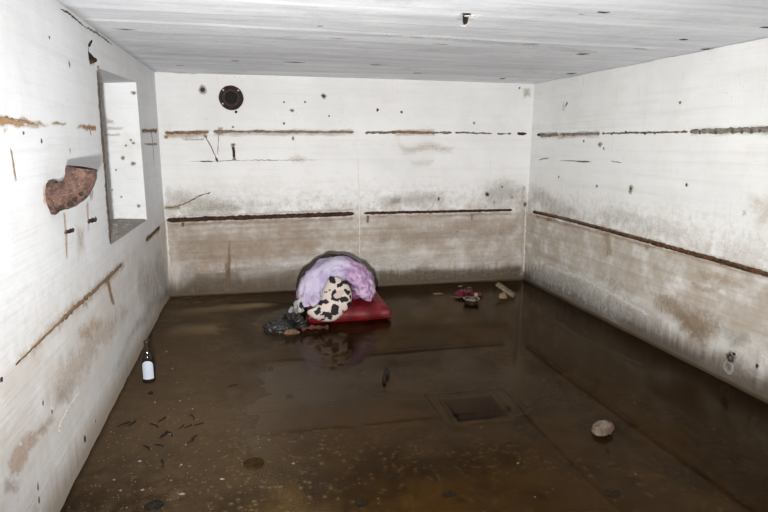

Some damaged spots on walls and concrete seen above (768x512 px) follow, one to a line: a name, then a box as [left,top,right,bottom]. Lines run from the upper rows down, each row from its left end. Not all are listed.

rust [0,116,42,127]
water stain [188,268,301,292]
water stain [374,259,522,282]
water stain [662,296,717,340]